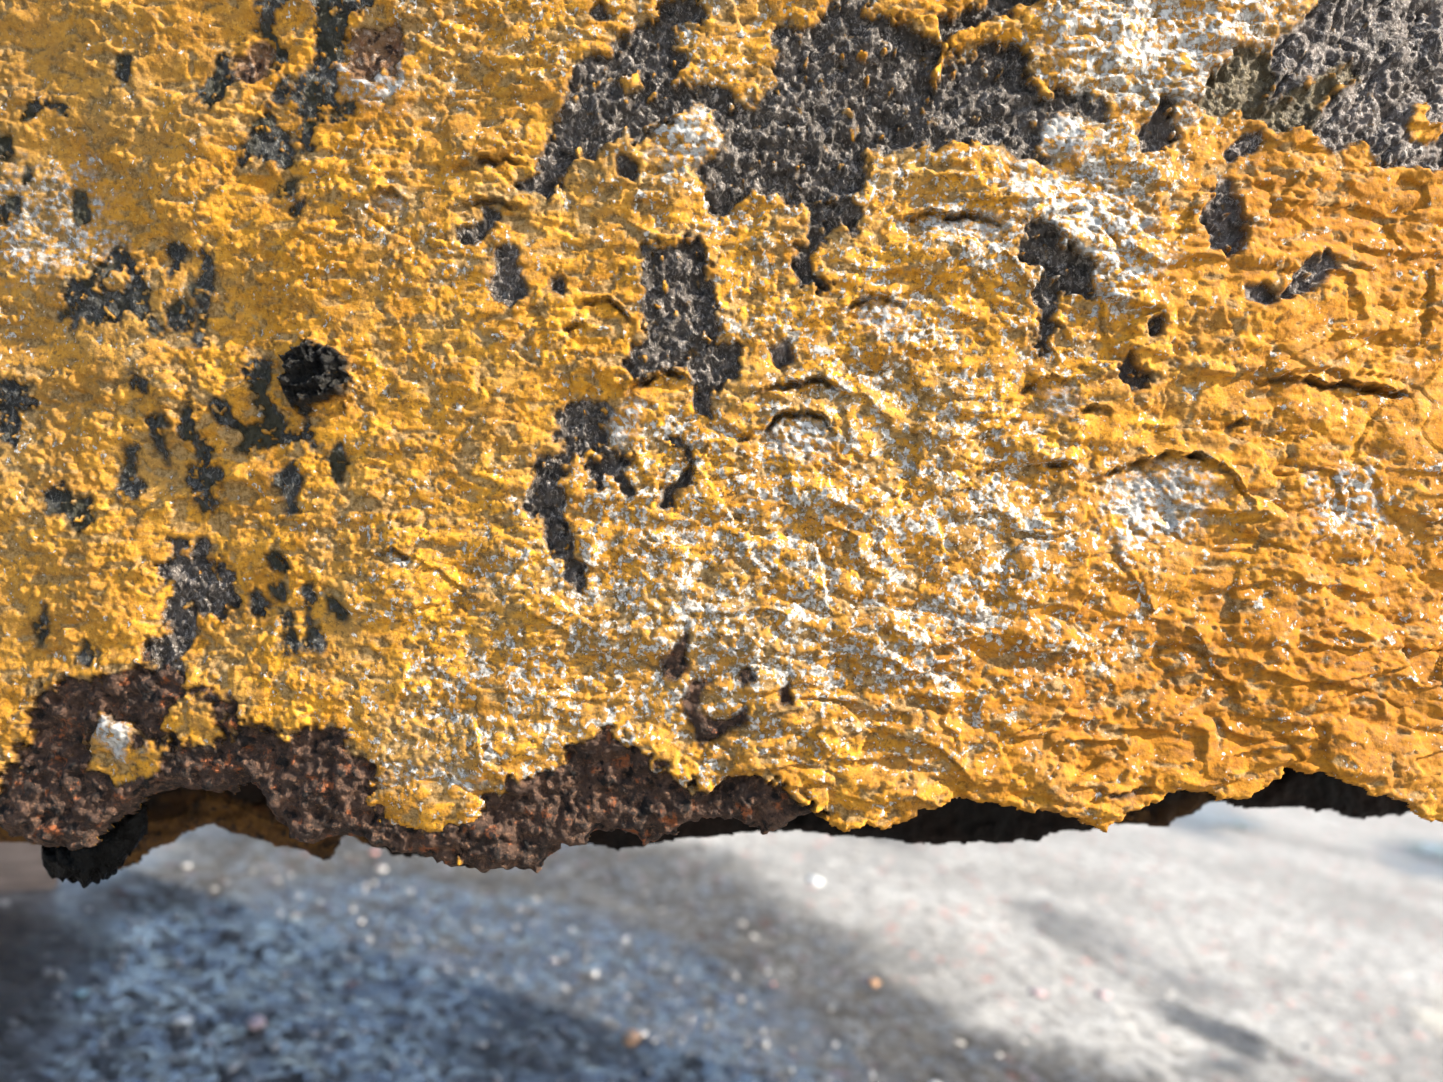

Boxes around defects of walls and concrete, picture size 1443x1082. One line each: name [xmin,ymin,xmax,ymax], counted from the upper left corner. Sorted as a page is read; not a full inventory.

peeling [193,0,405,217]
peeling [516,0,1107,295]
peeling [1267,0,1443,172]
peeling [58,241,215,348]
peeling [1017,220,1095,357]
peeling [43,481,94,532]
peeling [116,380,224,514]
peeling [208,338,354,516]
peeling [521,234,742,594]
peeling [142,538,348,676]
rust [0,652,829,873]
rust [660,634,749,746]